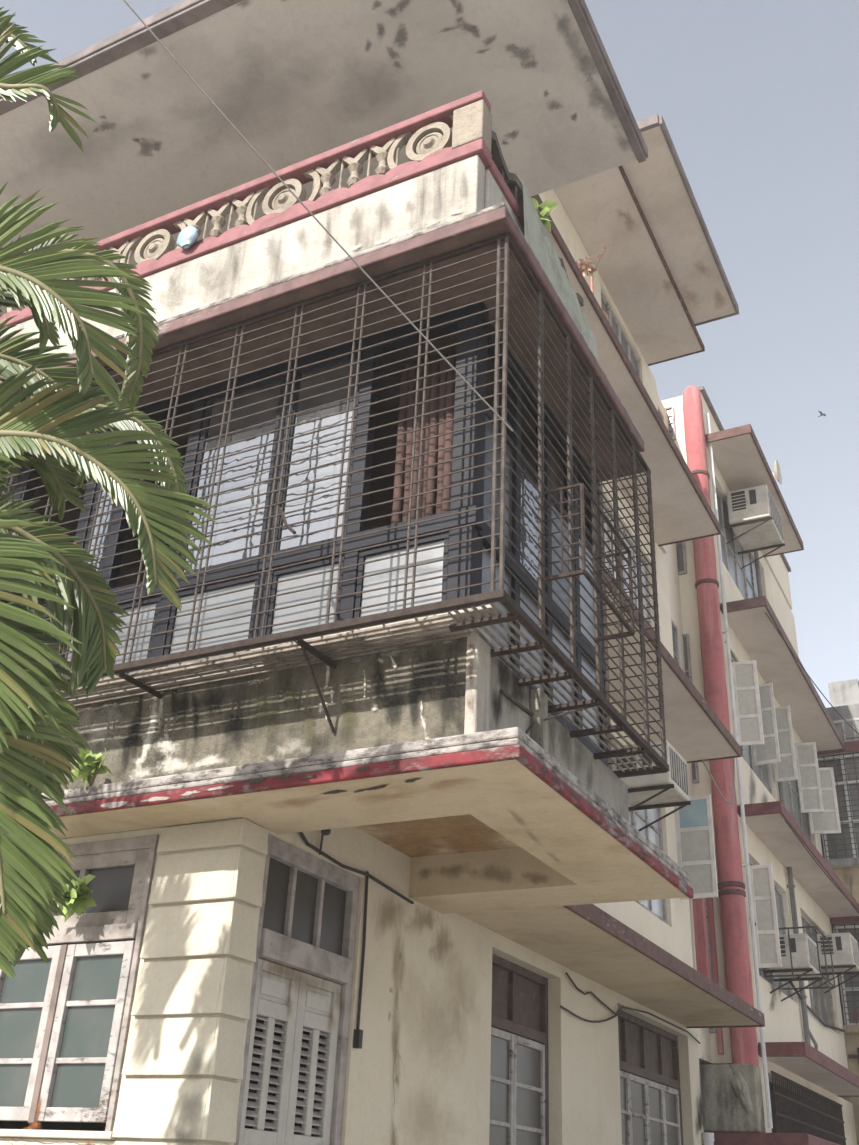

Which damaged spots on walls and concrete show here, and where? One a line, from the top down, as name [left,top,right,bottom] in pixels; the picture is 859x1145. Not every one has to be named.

damp [366,25,406,67]
damp [374,0,408,15]
damp [444,0,495,53]
damp [364,654,455,739]
damp [494,660,533,722]
damp [123,689,222,780]
spalling [269,741,309,761]
peeling [143,774,316,802]
peeling [324,785,388,794]